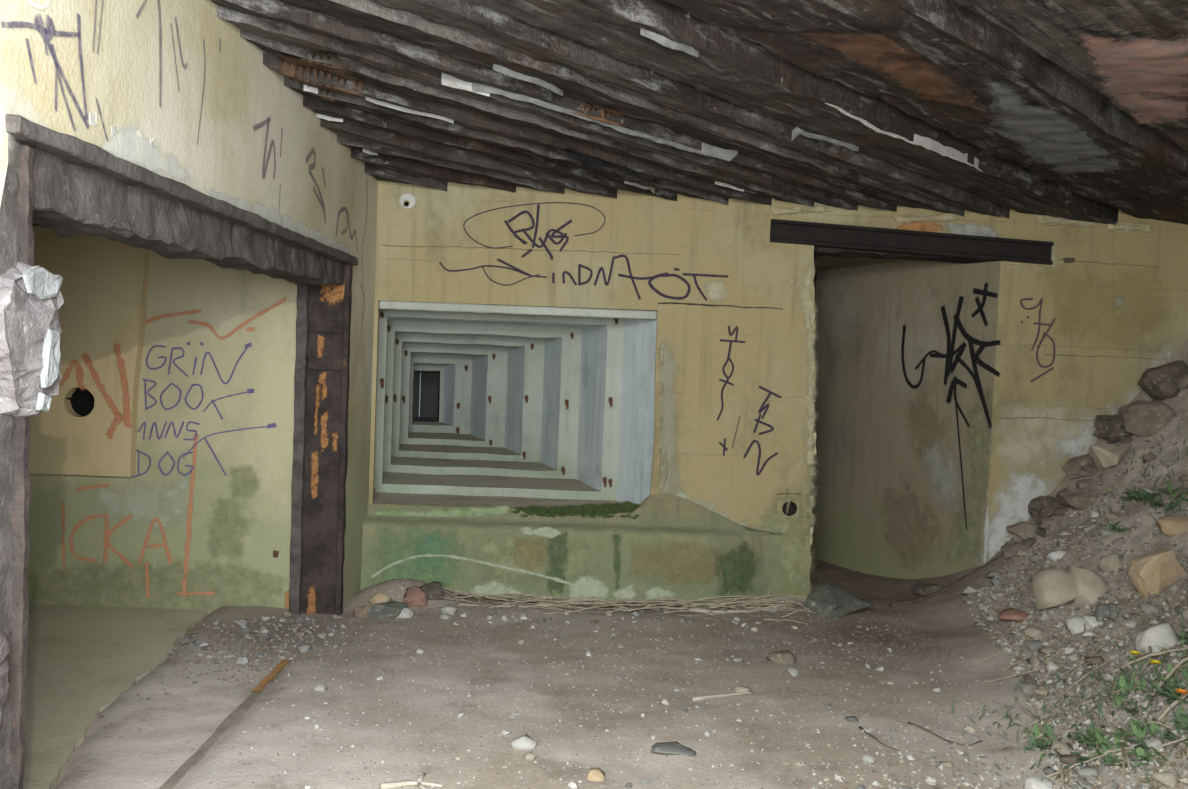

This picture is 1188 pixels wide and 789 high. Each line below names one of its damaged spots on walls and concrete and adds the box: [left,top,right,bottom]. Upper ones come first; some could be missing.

corrosion [320,280,345,305]
corrosion [311,372,338,499]
leakage [371,533,675,600]